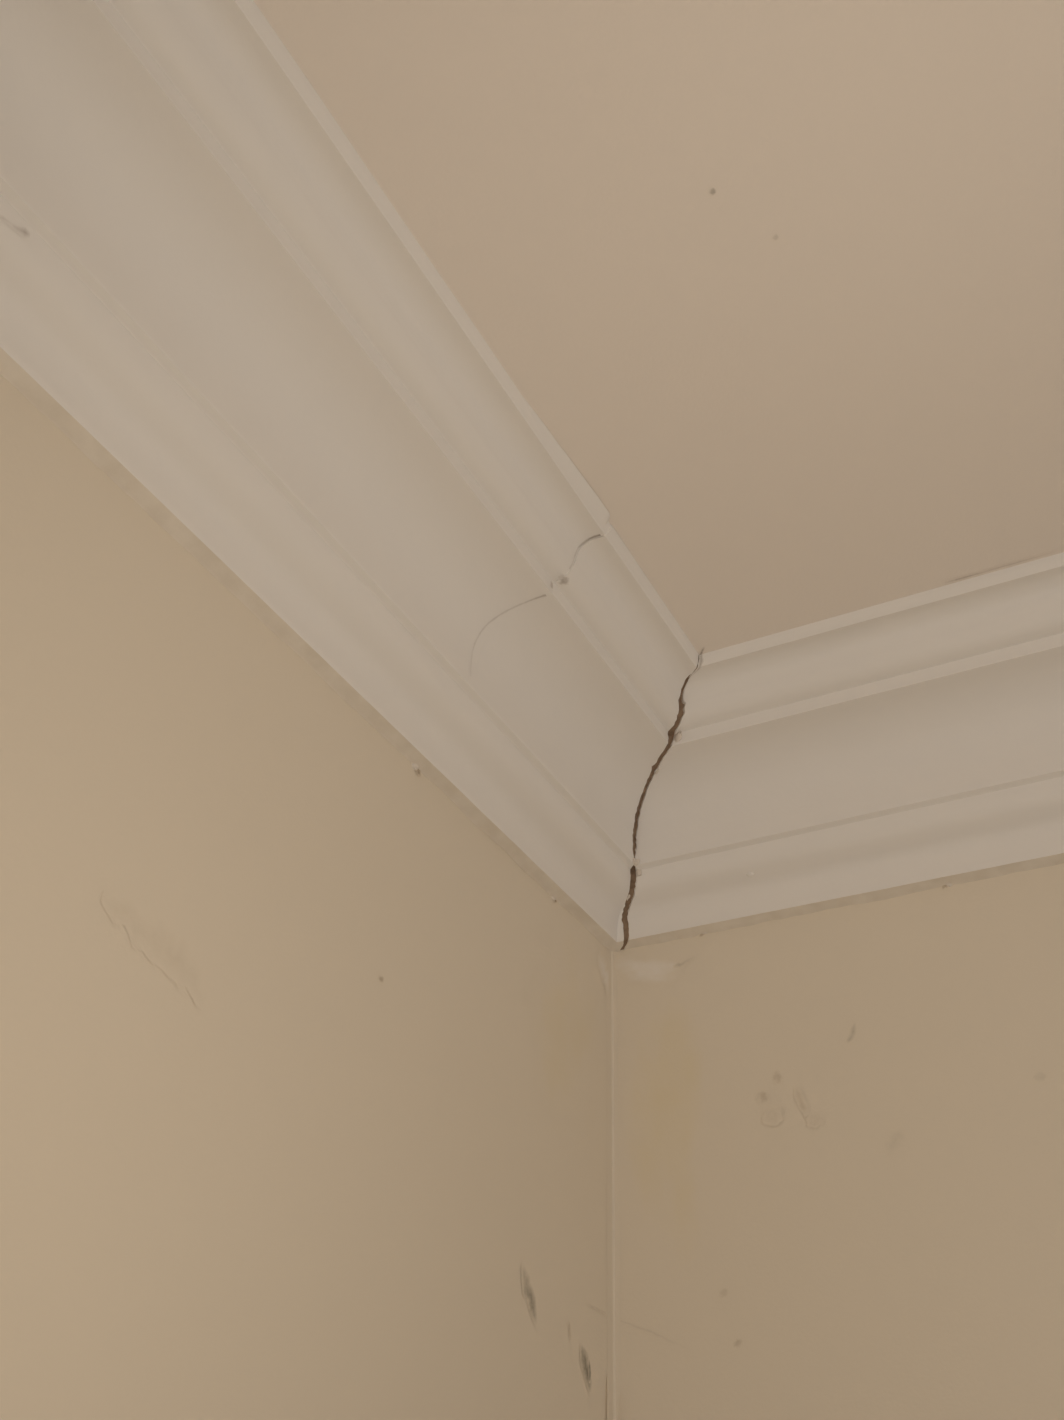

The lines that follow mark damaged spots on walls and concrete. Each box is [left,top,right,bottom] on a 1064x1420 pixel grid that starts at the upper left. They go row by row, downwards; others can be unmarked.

crack [620,646,705,950]